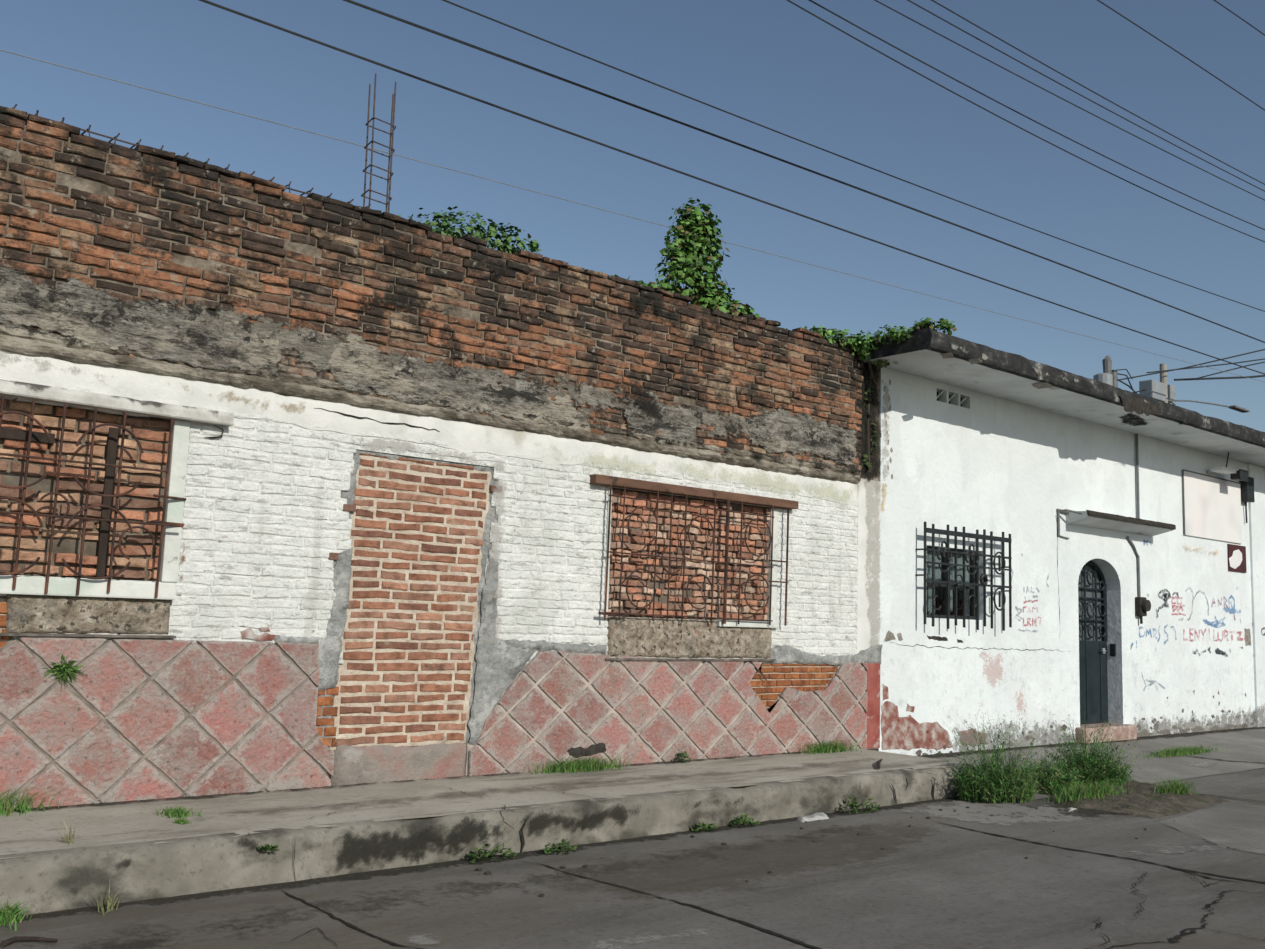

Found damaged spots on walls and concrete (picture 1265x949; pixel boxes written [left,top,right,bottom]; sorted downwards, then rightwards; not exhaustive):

leakage [358,292,453,313]
crack [316,408,440,432]
flaking render [749,664,839,710]
peeling [881,684,987,756]
leakage [954,722,1076,752]
leakage [1134,706,1265,737]
leakage [524,804,640,835]
leakage [337,817,501,869]
crack [1091,849,1262,947]